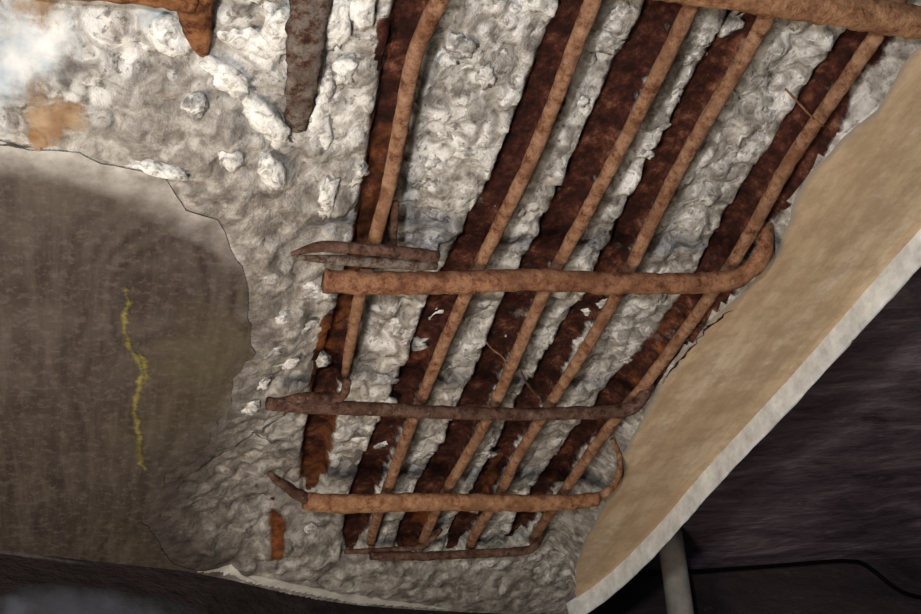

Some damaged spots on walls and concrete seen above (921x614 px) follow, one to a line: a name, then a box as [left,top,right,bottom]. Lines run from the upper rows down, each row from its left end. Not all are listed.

crack [0,142,36,150]
rust [351,0,429,244]
rust [440,0,584,272]
rust [518,0,682,269]
rust [593,9,757,273]
spalling [549,5,846,273]
rust [694,28,868,273]
spalling [719,32,921,272]
damp [121,289,147,470]
spalling [0,0,650,614]
spalling [486,291,680,408]
spalling [621,280,751,404]